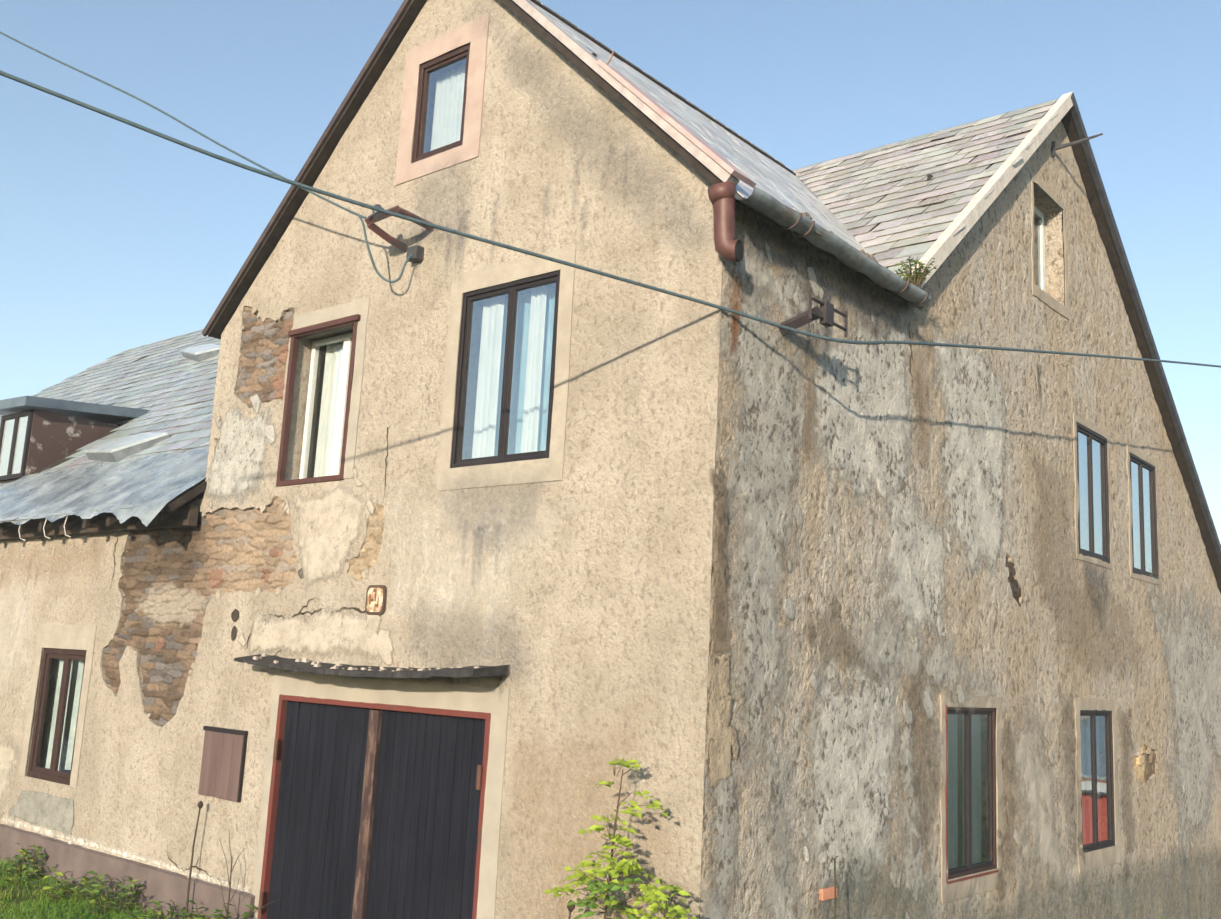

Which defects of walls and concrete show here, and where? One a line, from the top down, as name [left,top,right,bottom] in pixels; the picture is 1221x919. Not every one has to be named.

flaking render [102,306,393,726]
peeling [705,237,1024,919]